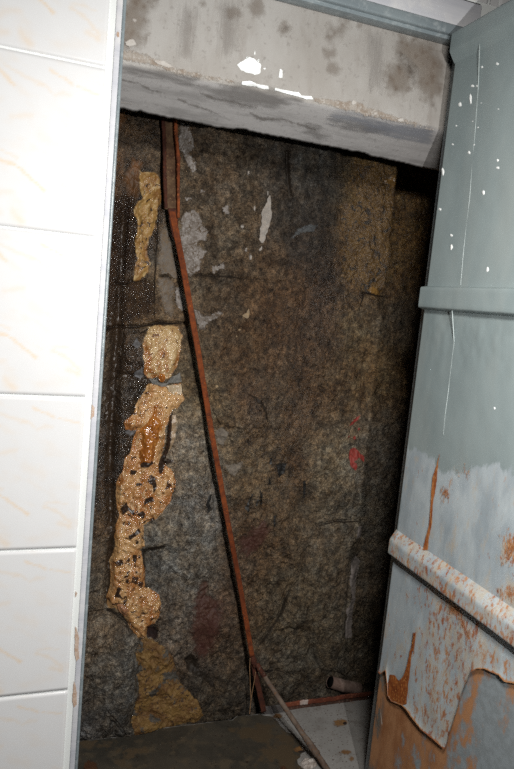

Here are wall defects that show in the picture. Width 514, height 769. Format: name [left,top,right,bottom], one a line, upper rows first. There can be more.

leakage [389,41,441,96]
leakage [78,172,303,769]
corrosion [422,455,450,550]